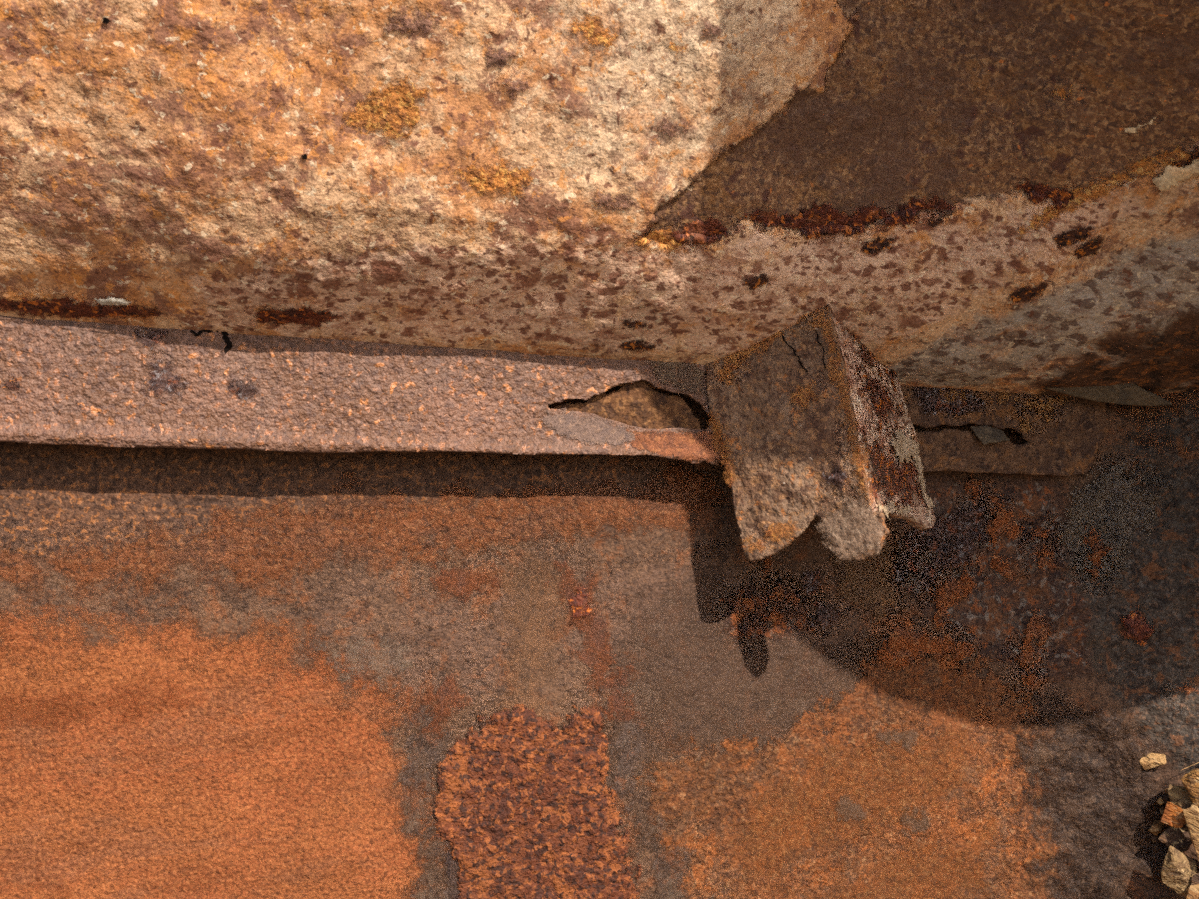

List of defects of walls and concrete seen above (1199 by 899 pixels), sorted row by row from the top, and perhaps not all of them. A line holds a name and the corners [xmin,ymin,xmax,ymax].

rust [635,195,957,251]
peeling [644,0,1199,259]
water stain [502,556,567,721]
rust [0,295,1071,899]